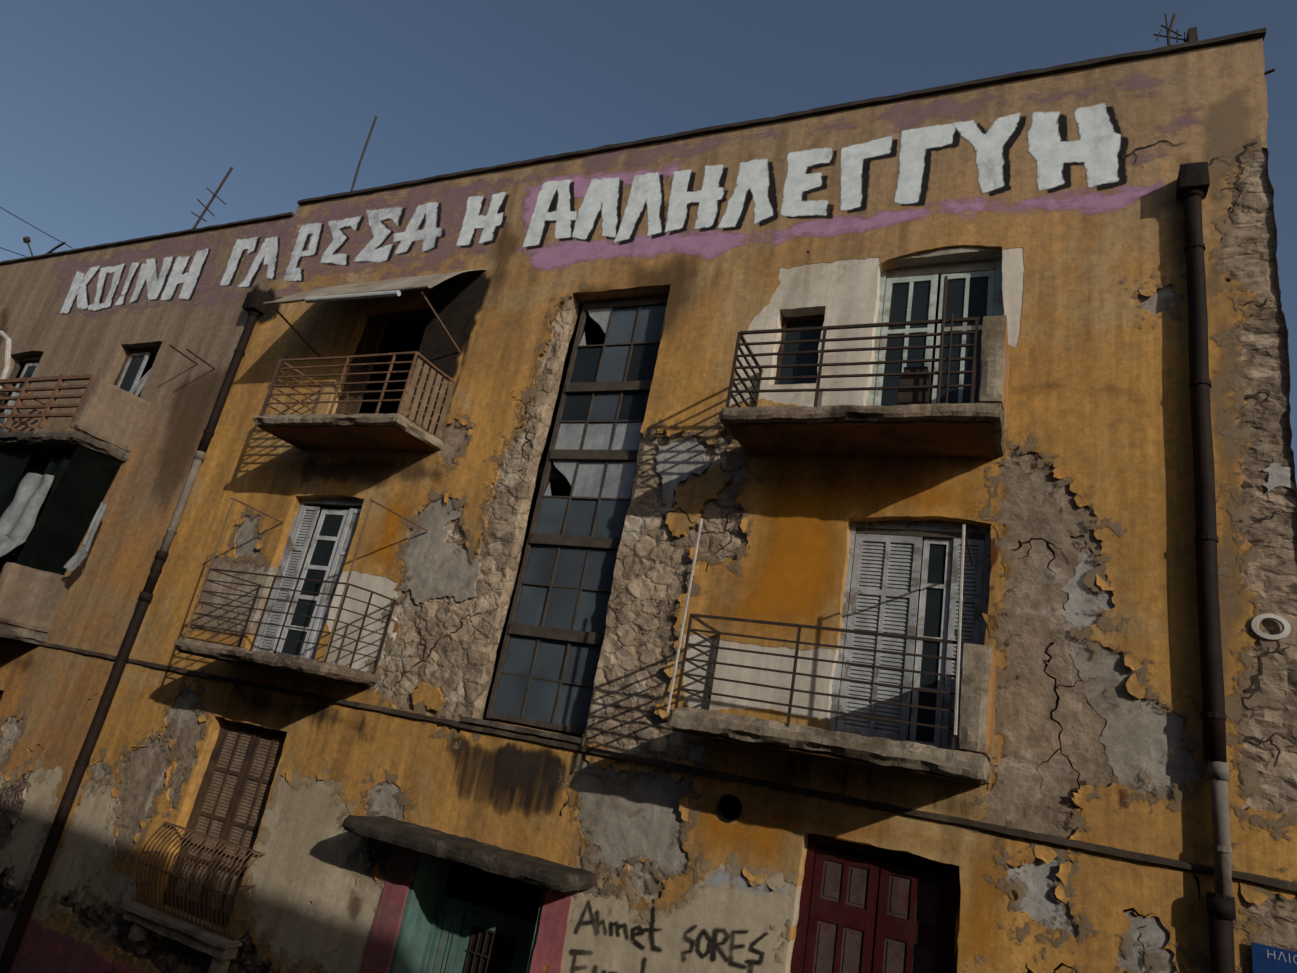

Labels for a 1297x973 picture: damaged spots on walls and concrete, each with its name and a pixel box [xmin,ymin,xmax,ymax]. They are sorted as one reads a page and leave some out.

peeling [1002,248,1025,348]
flaking render [1116,266,1187,329]
peeling [189,501,277,644]
flaking render [325,283,587,750]
flaking render [1209,135,1297,847]
peeling [0,680,213,973]
peeling [227,751,417,973]
water stain [451,736,565,814]
peeling [542,415,839,973]
crack [1036,642,1098,815]
flaking render [971,429,1211,973]
flaking render [1231,863,1297,973]